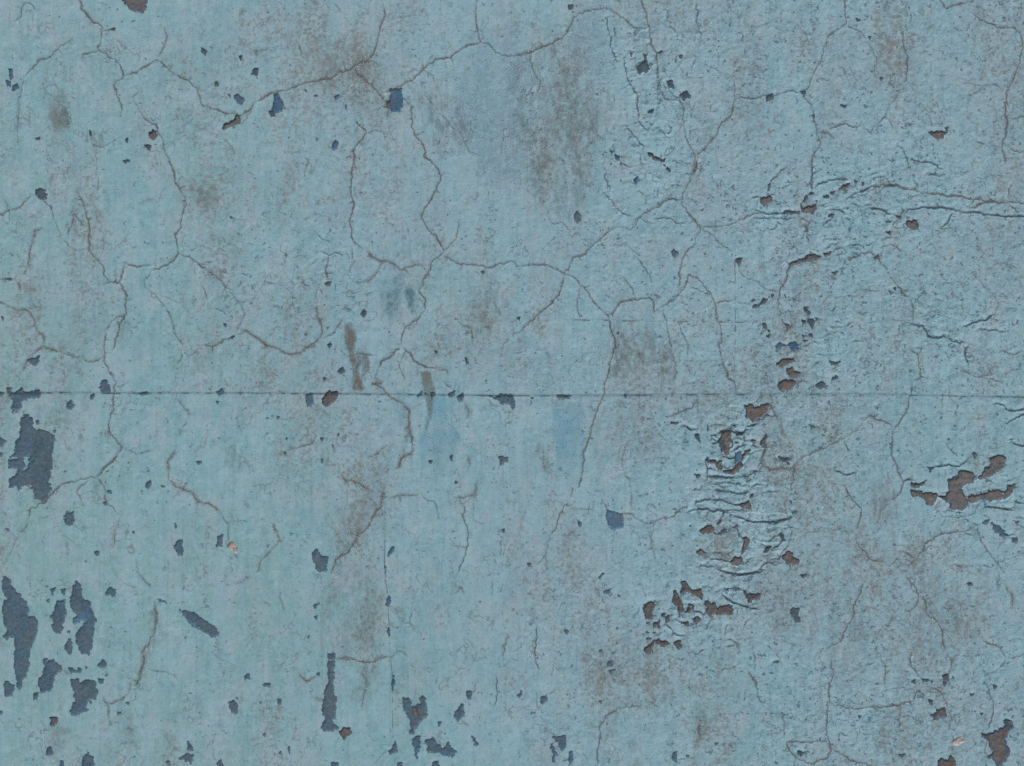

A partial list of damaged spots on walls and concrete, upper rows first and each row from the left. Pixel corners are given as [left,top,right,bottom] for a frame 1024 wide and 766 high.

crack [0,117,211,526]
crack [79,0,1024,613]
peeling [0,387,56,502]
spalling [670,403,770,475]
spalling [910,452,1016,511]
peeling [2,576,107,716]
spalling [642,581,734,654]
crack [784,444,1022,766]
peeling [316,653,352,740]
peeling [391,675,457,766]
crack [575,703,656,763]
spalling [981,719,1014,766]